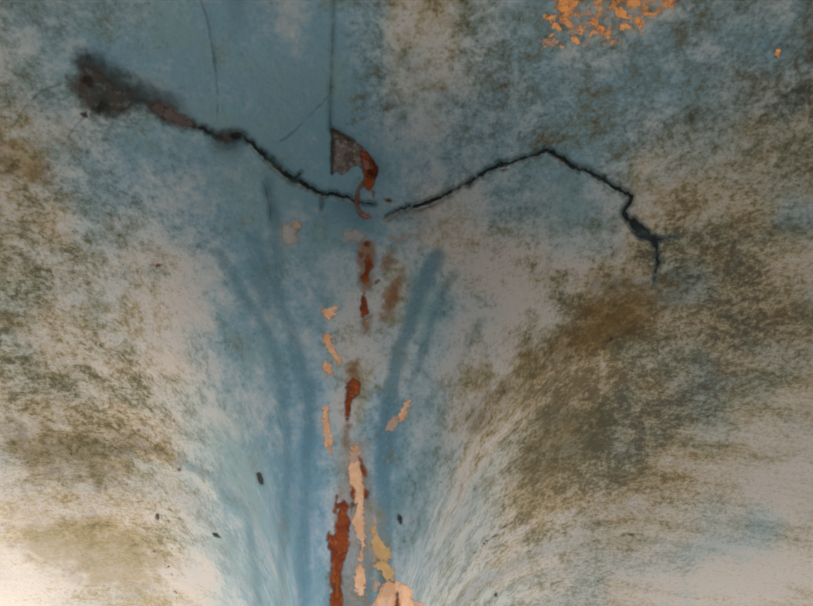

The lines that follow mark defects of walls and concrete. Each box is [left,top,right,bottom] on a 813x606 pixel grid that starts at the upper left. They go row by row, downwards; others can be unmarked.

peeling [542,0,677,49]
damp [70,55,163,118]
crack [192,126,220,136]
crack [242,134,376,208]
spalling [330,128,378,190]
crack [395,148,675,281]
corrosion [359,241,389,328]
corrosion [344,364,360,420]
corrosion [327,495,351,606]